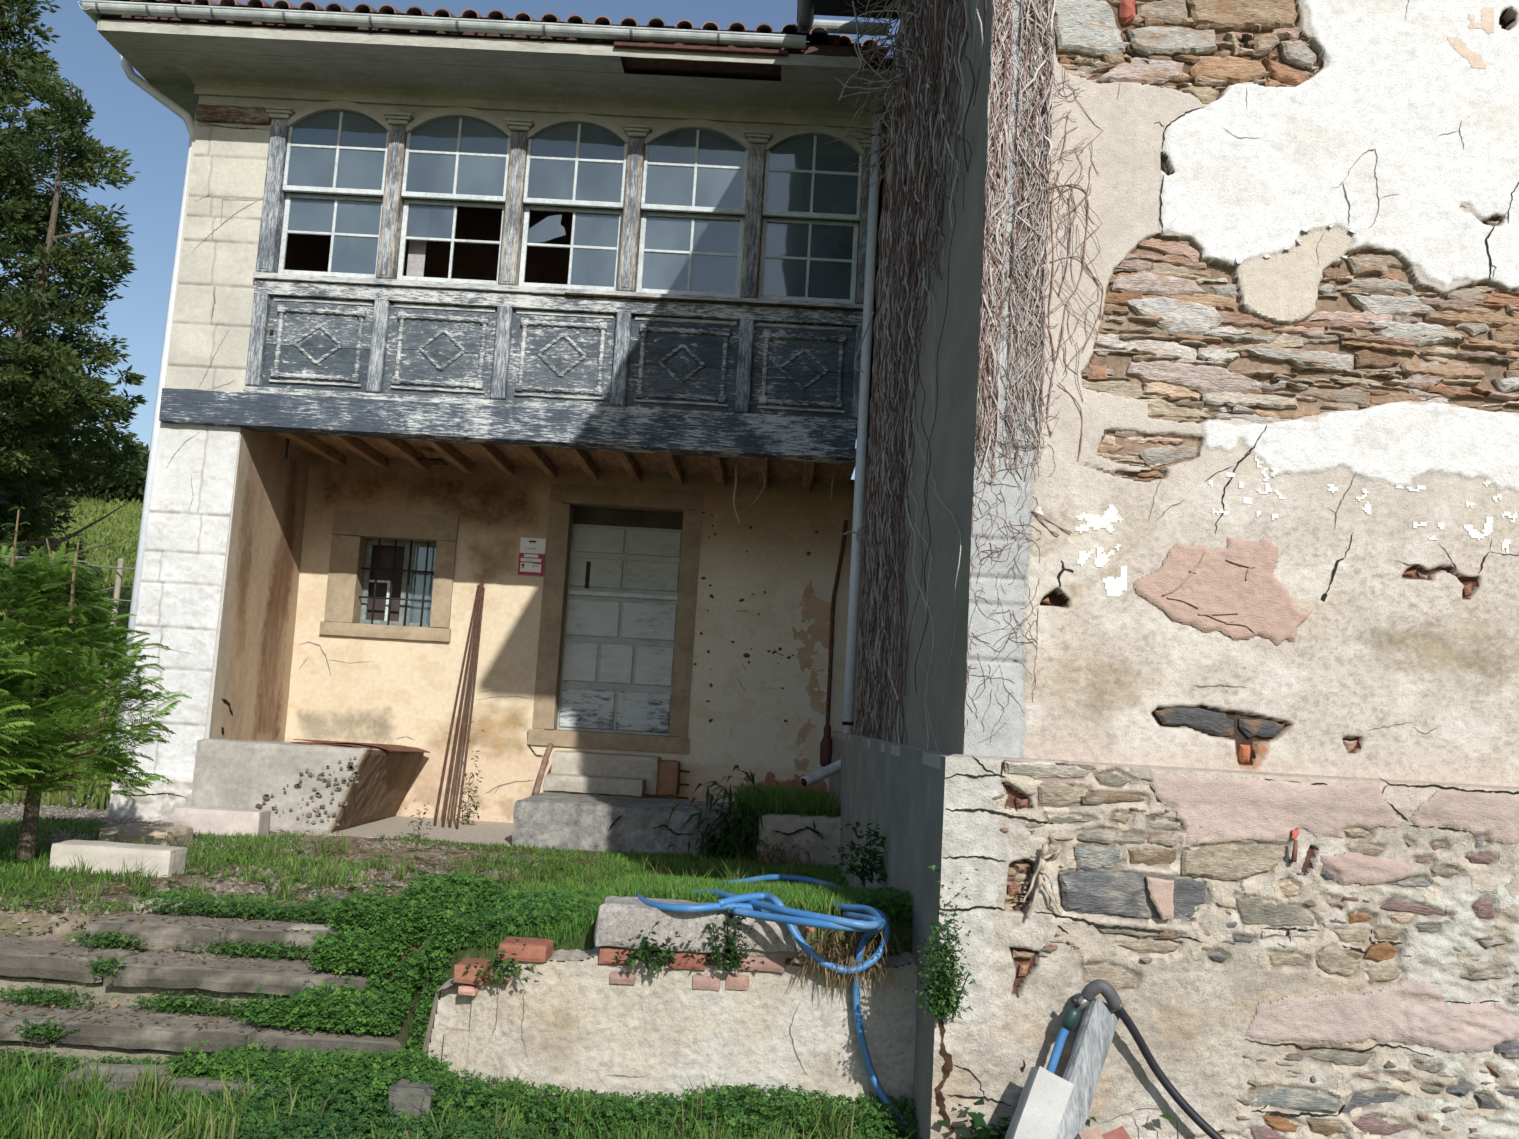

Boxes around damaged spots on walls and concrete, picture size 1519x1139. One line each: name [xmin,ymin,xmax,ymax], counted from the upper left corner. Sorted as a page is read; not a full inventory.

spalling [1053,0,1324,104]
crack [1460,182,1519,279]
spalling [1082,224,1519,482]
crack [1321,472,1357,602]
spalling [1402,565,1479,599]
spalling [1153,706,1286,765]
crack [945,756,1055,824]
crack [1379,778,1519,832]
crack [941,906,1201,942]
spalling [991,761,1519,1008]
crack [935,992,1011,1132]
spalling [1186,1042,1519,1139]